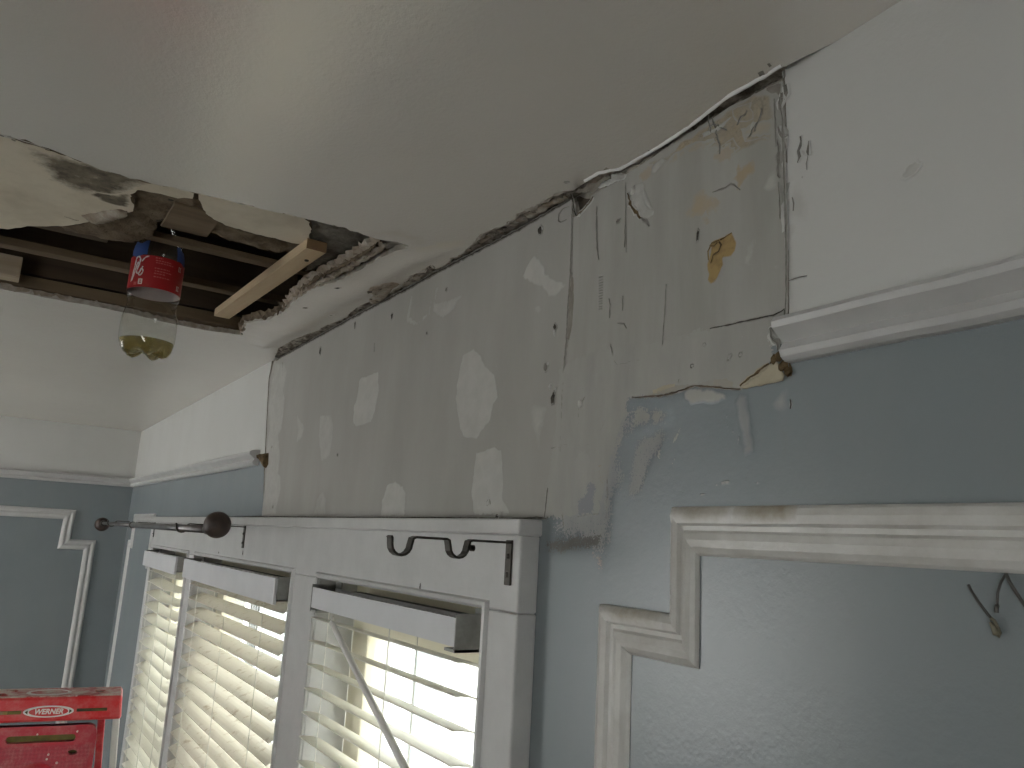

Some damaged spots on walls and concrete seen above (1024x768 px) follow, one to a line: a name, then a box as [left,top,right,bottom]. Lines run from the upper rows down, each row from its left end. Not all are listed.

damp [21,143,162,209]
spalling [60,179,212,243]
spalling [90,237,387,335]
spalling [211,222,299,253]
spalling [275,64,791,361]
crack [561,214,586,427]
damp [706,231,737,285]
crack [710,97,807,351]
flaking render [544,309,793,521]